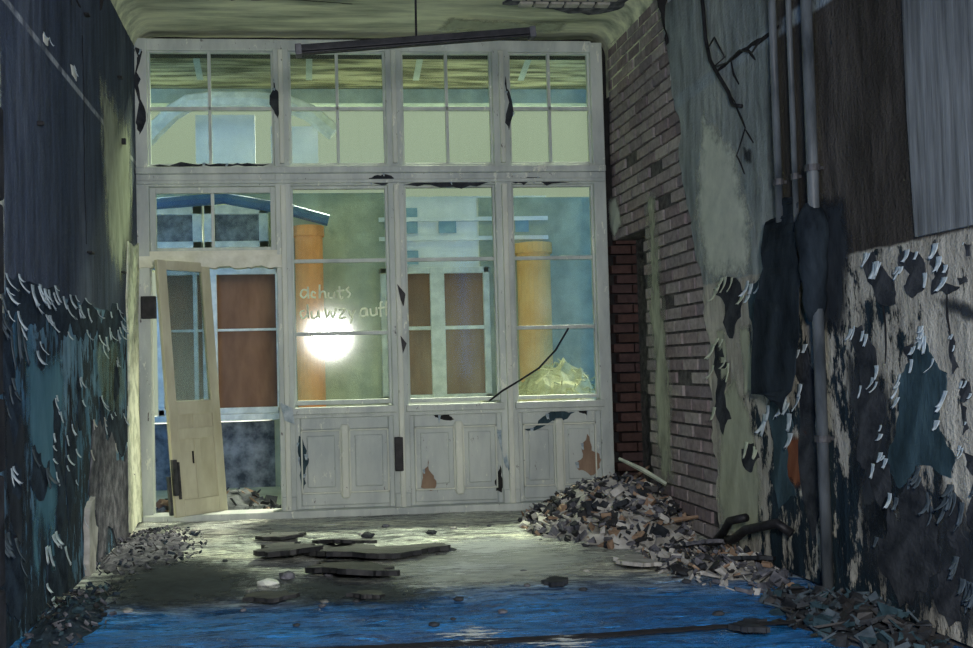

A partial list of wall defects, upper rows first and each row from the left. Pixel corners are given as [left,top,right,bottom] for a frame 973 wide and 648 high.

flaking render [503,0,628,15]
peeling [505,76,515,128]
crack [717,25,779,174]
flaking render [607,0,819,539]
peeling [860,239,968,306]
peeling [1,273,135,608]
peeling [421,461,437,491]
peeling [525,411,588,431]
peeling [575,434,601,476]
peeling [844,325,973,627]